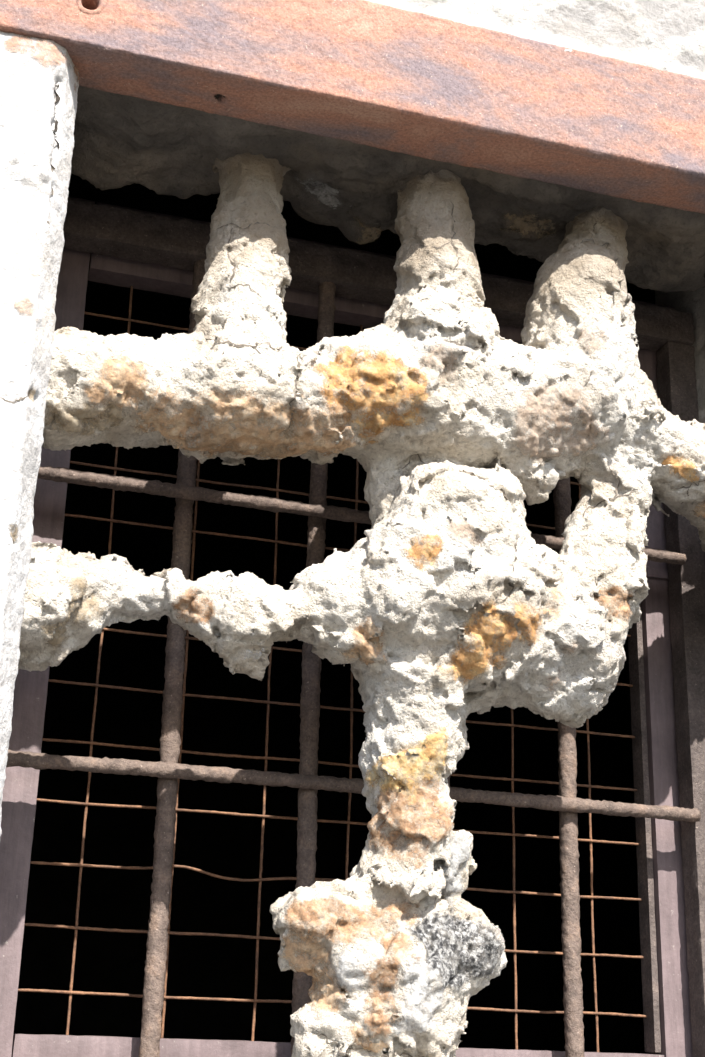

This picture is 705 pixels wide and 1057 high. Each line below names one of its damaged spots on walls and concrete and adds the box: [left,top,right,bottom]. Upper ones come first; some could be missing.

corrosion [4,36,79,89]
crack [220,222,270,298]
crack [421,203,460,273]
corrosion [84,356,149,420]
corrosion [316,345,457,444]
corrosion [405,534,443,569]
corrosion [343,618,387,666]
corrosion [448,590,562,682]
corrosion [594,586,632,620]
corrosion [364,726,448,803]
corrosion [282,895,419,1053]